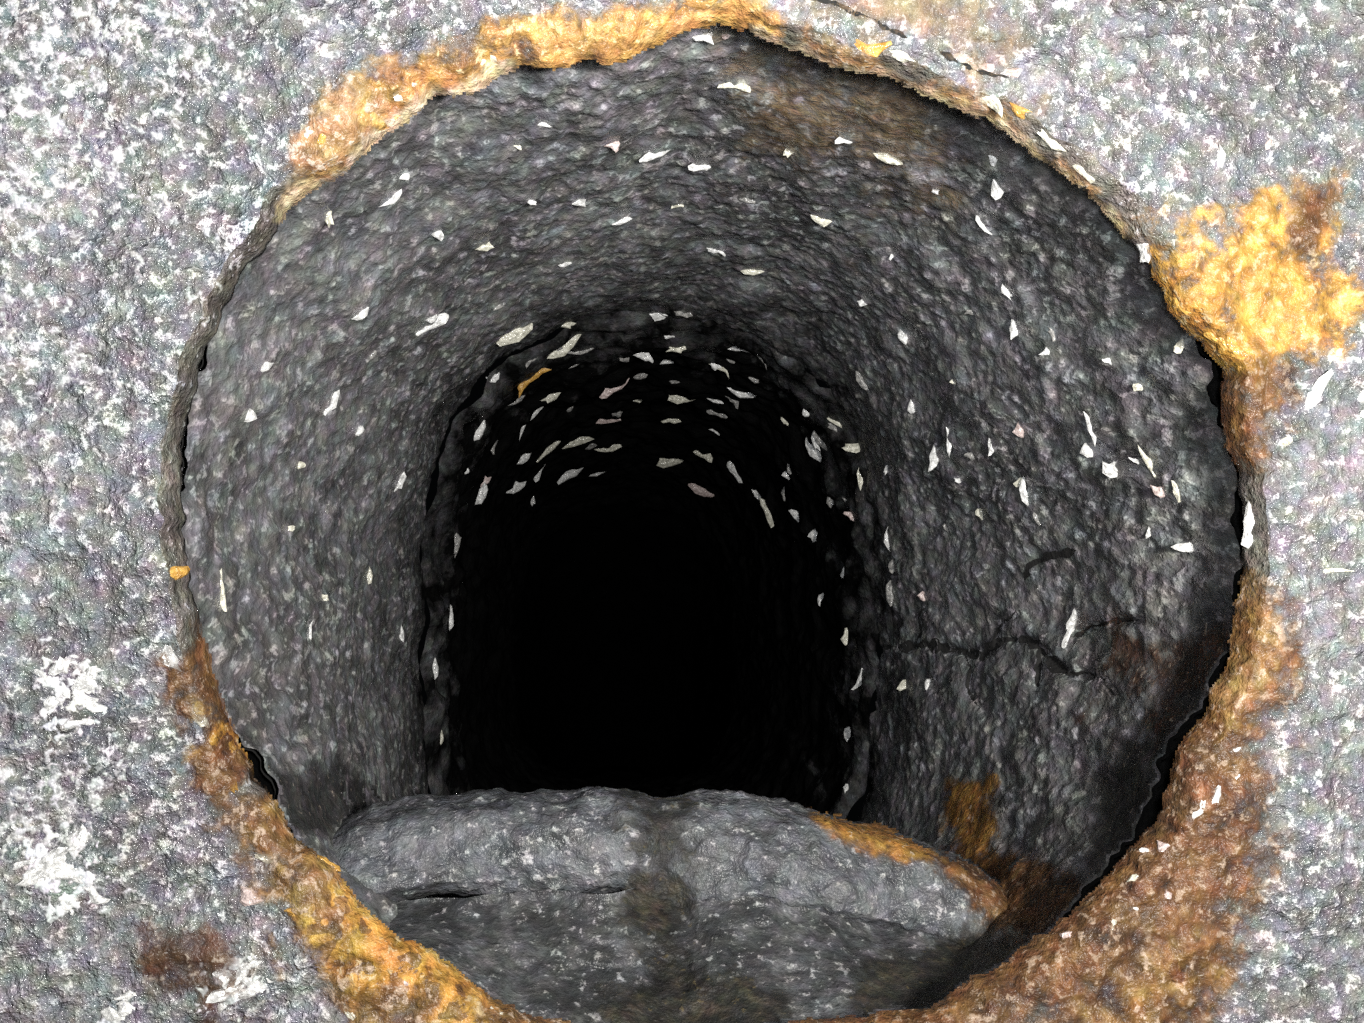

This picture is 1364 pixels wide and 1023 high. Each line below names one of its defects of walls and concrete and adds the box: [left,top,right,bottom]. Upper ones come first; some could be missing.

crack [813,0,907,38]
crack [940,51,1022,78]
corrosion [1148,185,1364,473]
corrosion [170,566,190,580]
crack [1023,547,1076,580]
crack [869,608,1139,705]
corrosion [156,637,571,1023]
corrosion [788,571,1304,1023]
corrosion [139,924,236,1023]